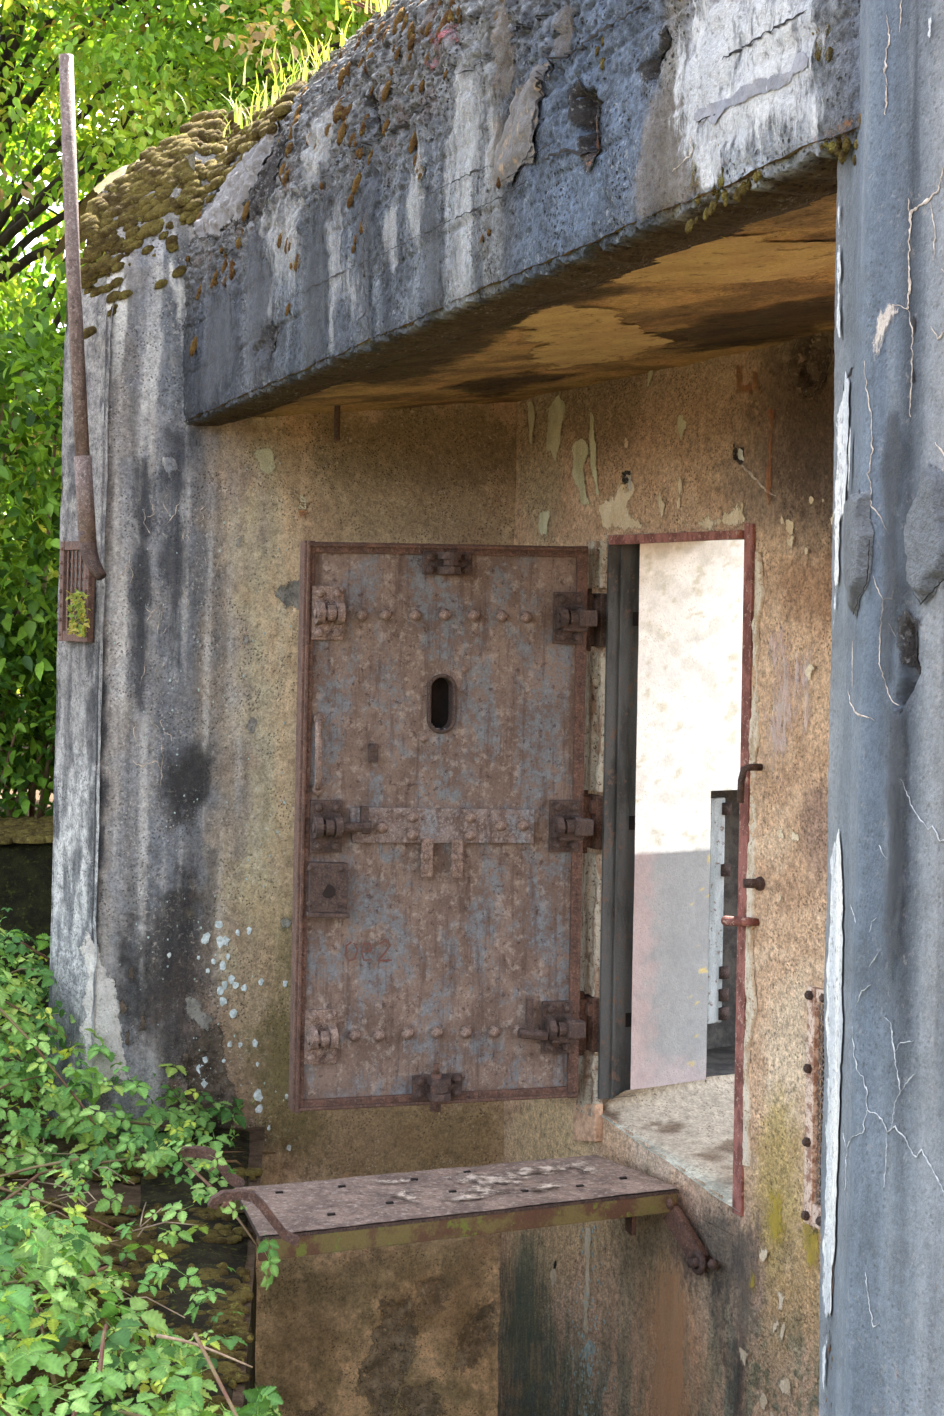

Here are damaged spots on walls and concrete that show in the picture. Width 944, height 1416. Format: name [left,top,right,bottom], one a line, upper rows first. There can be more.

peeling [490,47,555,186]
spalling [568,73,604,173]
leakage [195,232,273,406]
leakage [416,192,440,307]
leakage [338,272,630,398]
leakage [654,296,835,352]
crack [848,165,944,719]
leakage [129,429,194,708]
spalling [896,608,922,674]
crack [843,904,944,1192]